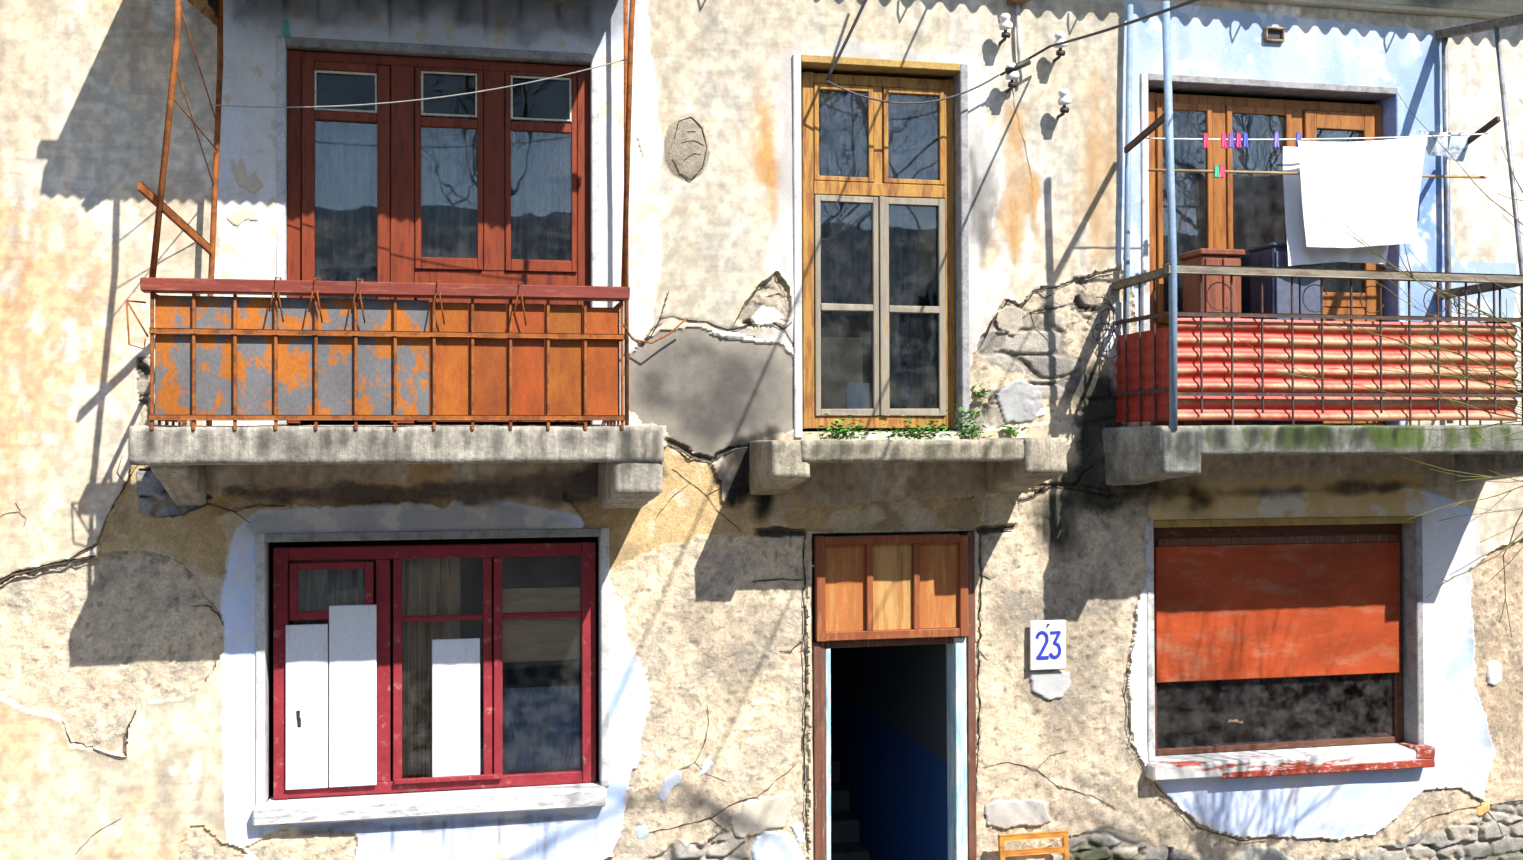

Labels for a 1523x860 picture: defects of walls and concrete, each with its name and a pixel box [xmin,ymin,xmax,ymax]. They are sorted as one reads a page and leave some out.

flaking render [0,465,455,753]
flaking render [179,825,358,860]
crack [650,439,808,852]
flaking render [567,265,1523,860]